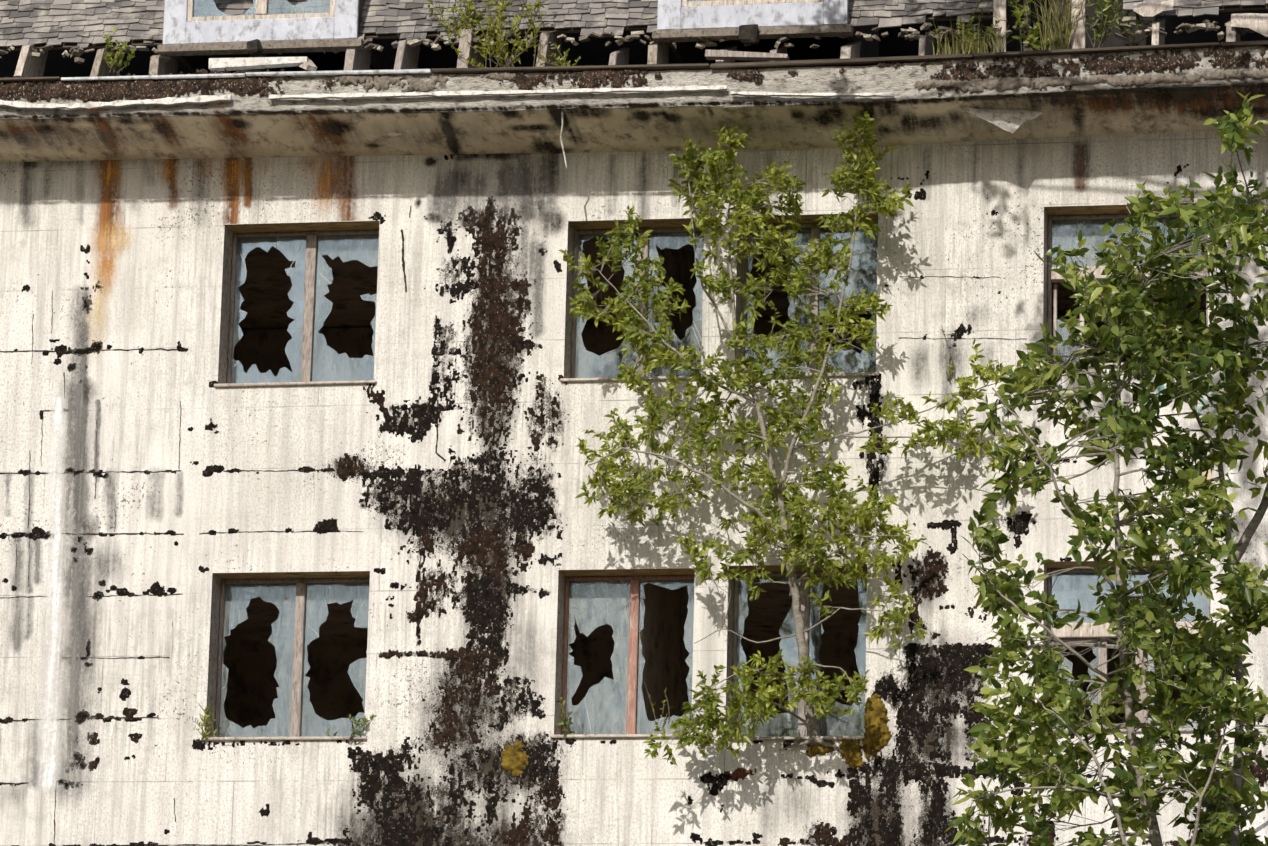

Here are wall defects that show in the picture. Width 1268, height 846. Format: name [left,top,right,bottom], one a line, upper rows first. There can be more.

rust [96,160,125,328]
rust [224,158,252,224]
water stain [0,81,1268,335]
water stain [477,302,514,448]
water stain [941,339,961,403]
water stain [418,486,510,608]
water stain [442,683,534,791]
water stain [905,642,972,766]
water stain [339,776,540,846]
water stain [858,789,902,846]